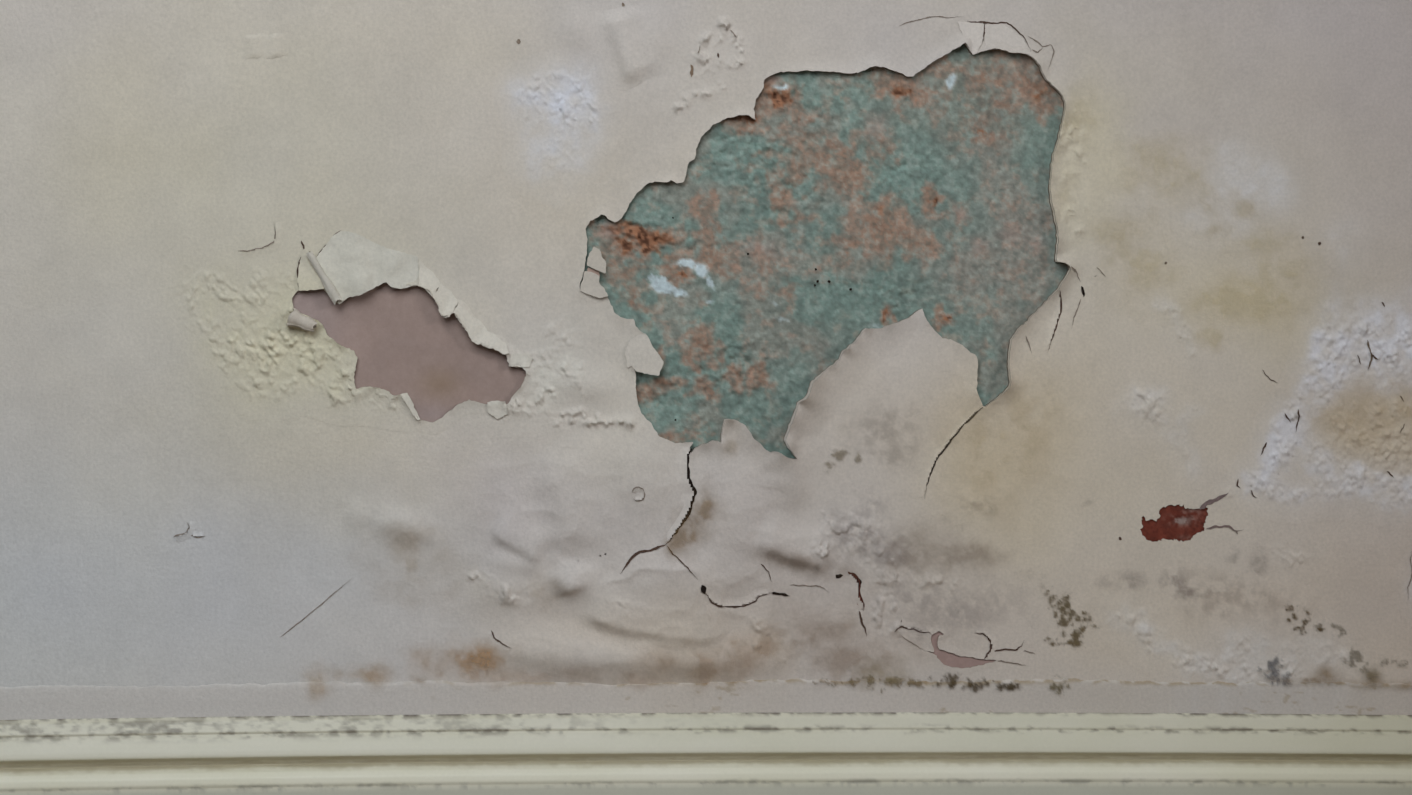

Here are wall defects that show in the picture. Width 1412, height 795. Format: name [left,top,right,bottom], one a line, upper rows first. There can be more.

crack [902,16,1055,69]
leakage [492,47,624,212]
peeling [158,5,1111,675]
leakage [1169,126,1412,628]
crack [918,404,983,497]
crack [621,445,935,651]
leakage [835,674,1019,693]
crack [976,626,1033,665]
leakage [1048,588,1400,684]